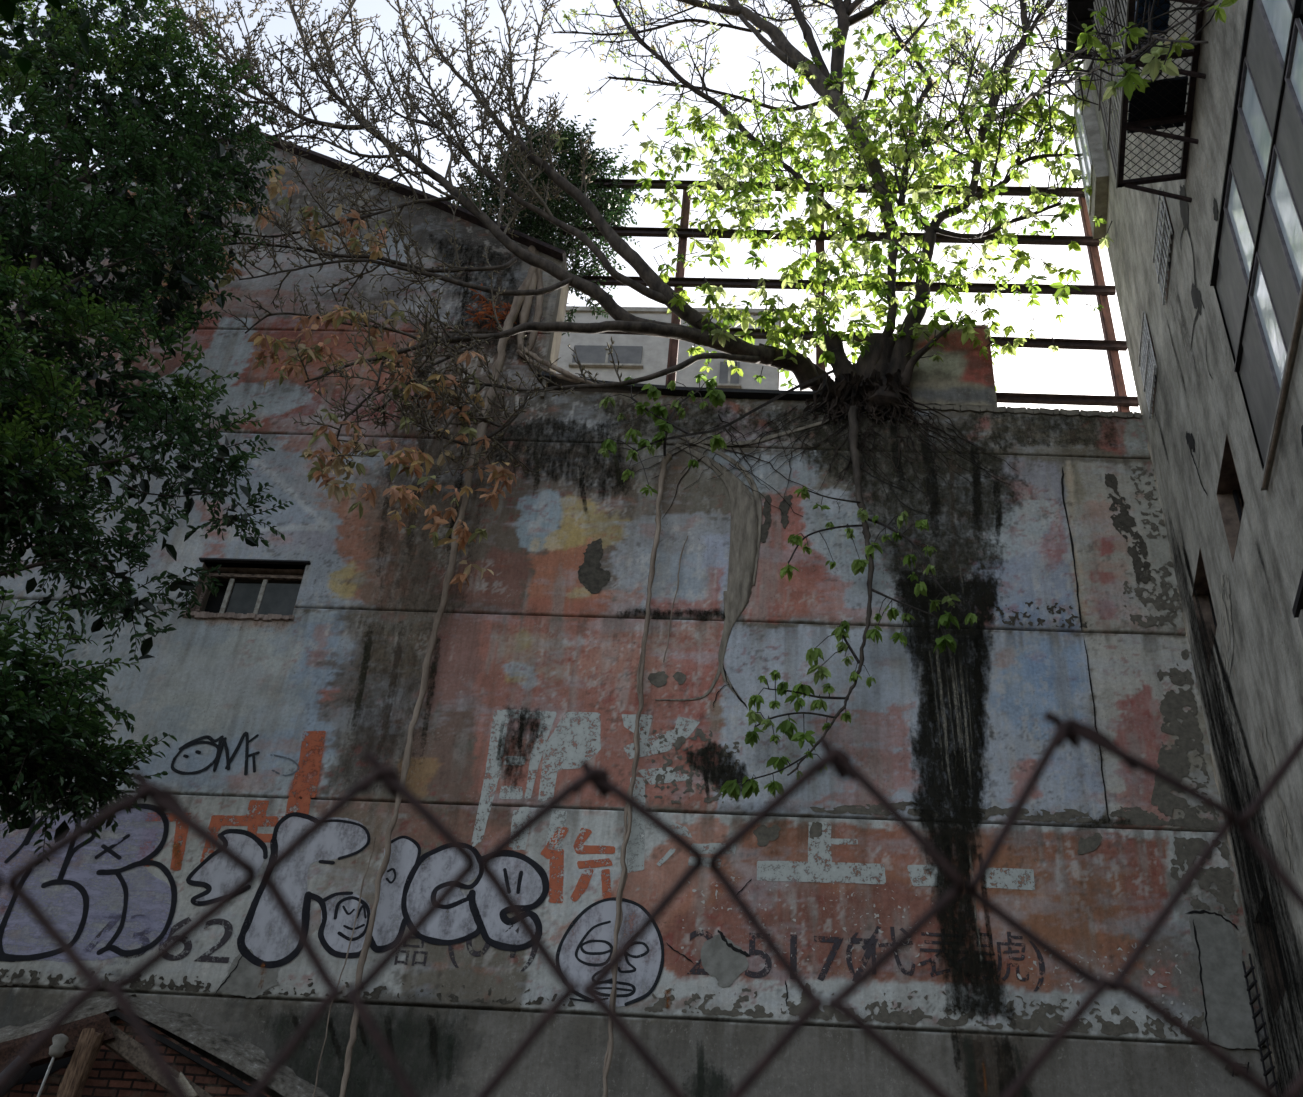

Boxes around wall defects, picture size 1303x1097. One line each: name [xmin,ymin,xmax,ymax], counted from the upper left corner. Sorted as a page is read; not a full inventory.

spalling [578,538,611,594]
peeling [1105,466,1183,627]
damp [345,621,440,781]
damp [483,397,1116,1097]
spalling [643,649,1263,1077]
peeling [0,968,114,988]
spalling [129,947,316,998]
damp [272,1007,466,1097]
peeling [342,980,575,1007]
crack [1185,910,1238,1040]